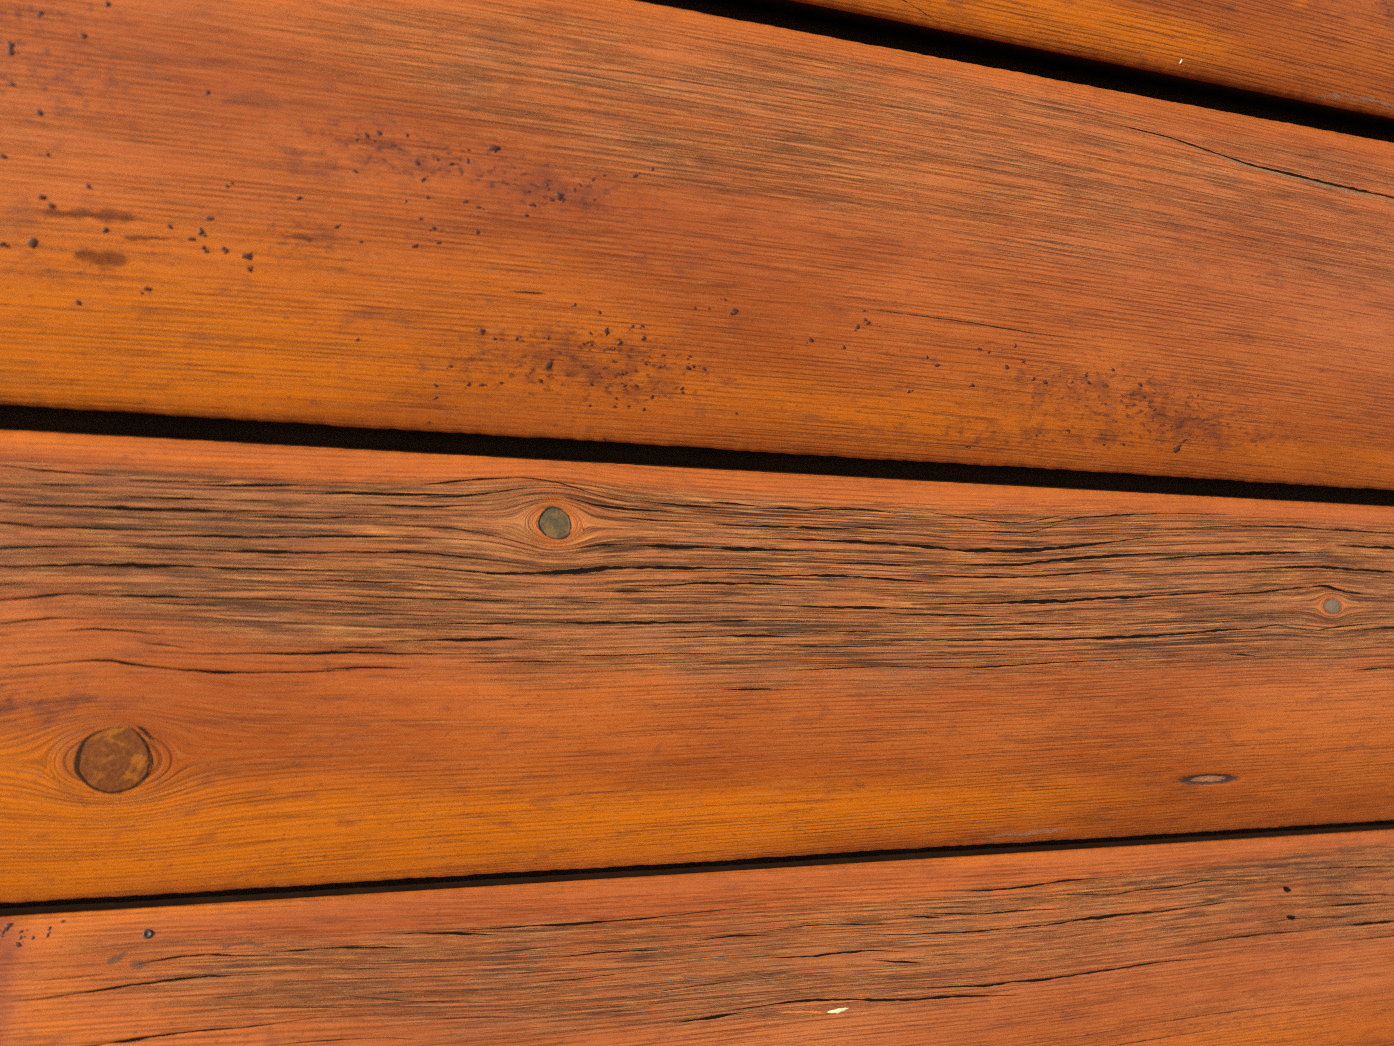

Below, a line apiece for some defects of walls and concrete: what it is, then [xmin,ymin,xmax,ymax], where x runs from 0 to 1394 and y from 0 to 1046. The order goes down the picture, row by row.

crack [1079,116,1394,198]
crack [0,465,1394,674]
crack [726,685,770,693]
crack [74,725,154,794]
crack [19,866,1394,1046]